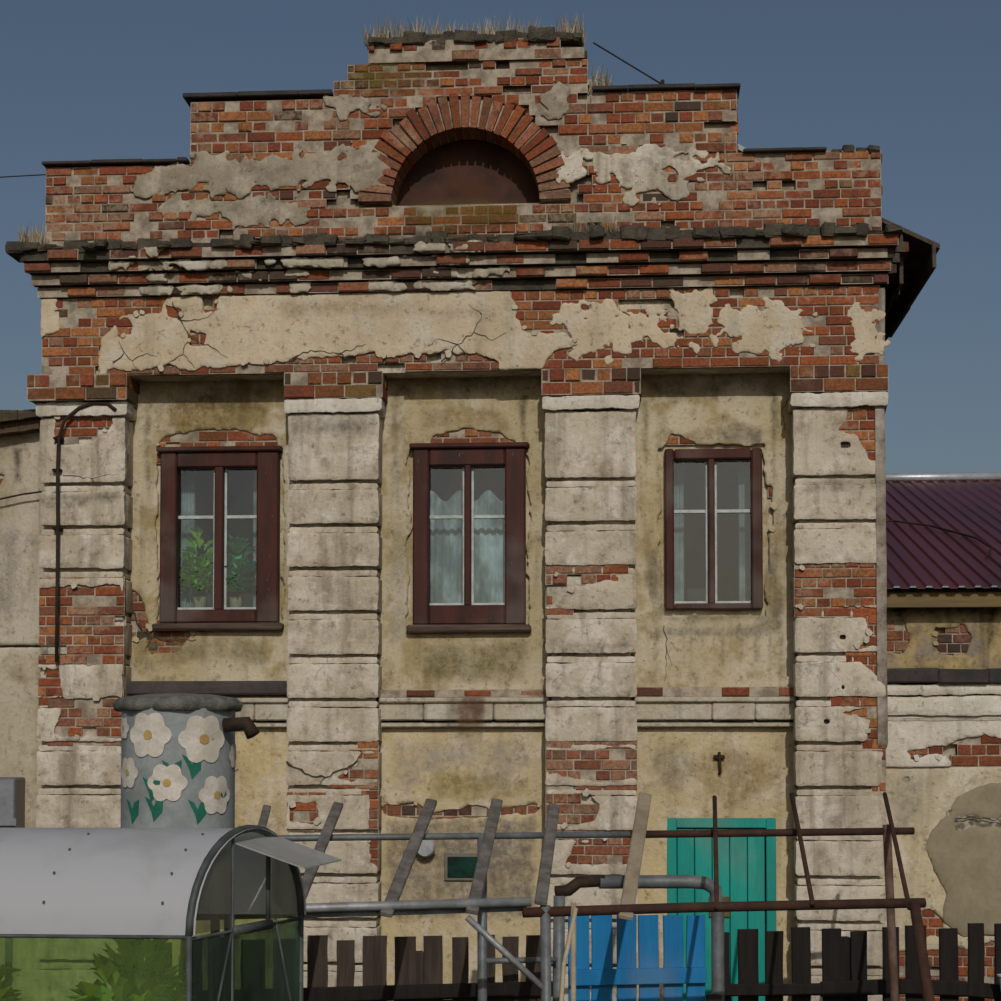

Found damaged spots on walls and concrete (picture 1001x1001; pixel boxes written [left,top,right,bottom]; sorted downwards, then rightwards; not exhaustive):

crack [113,302,226,371]
flaking render [41,295,500,376]
crack [429,309,505,363]
flaking render [510,285,880,370]
flaking render [838,406,876,461]
flaking render [545,564,629,616]
flaking render [794,562,909,676]
flaking render [38,577,203,747]
crack [286,761,359,784]
flaking render [287,740,638,868]
flaking render [830,696,887,792]
flaking render [907,734,1001,767]